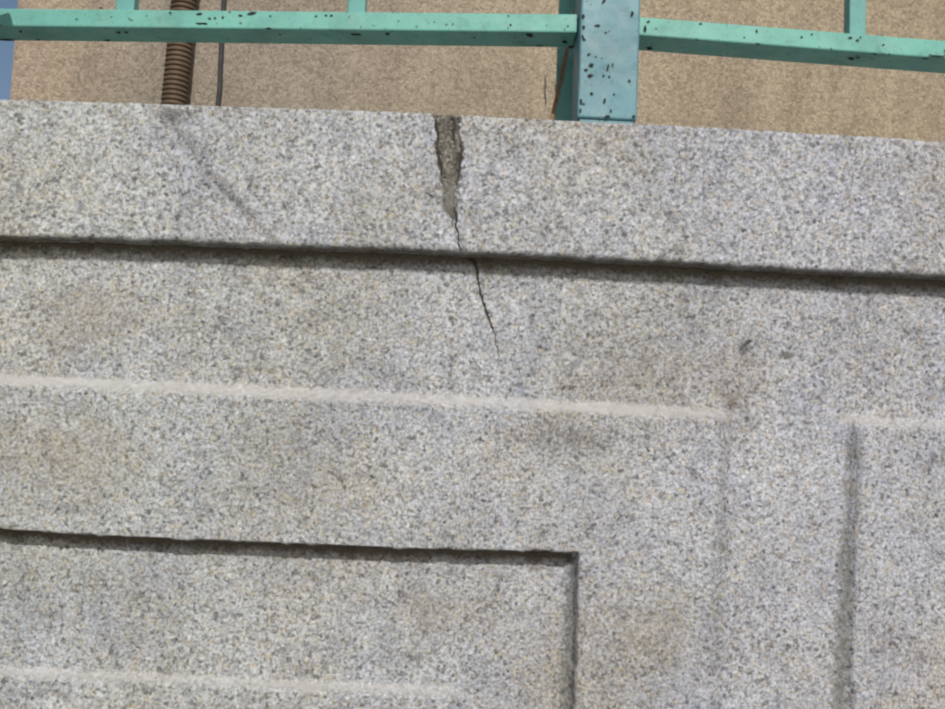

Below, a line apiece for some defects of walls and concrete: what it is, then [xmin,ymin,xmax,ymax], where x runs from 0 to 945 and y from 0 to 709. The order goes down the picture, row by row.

crack [451,196,499,362]